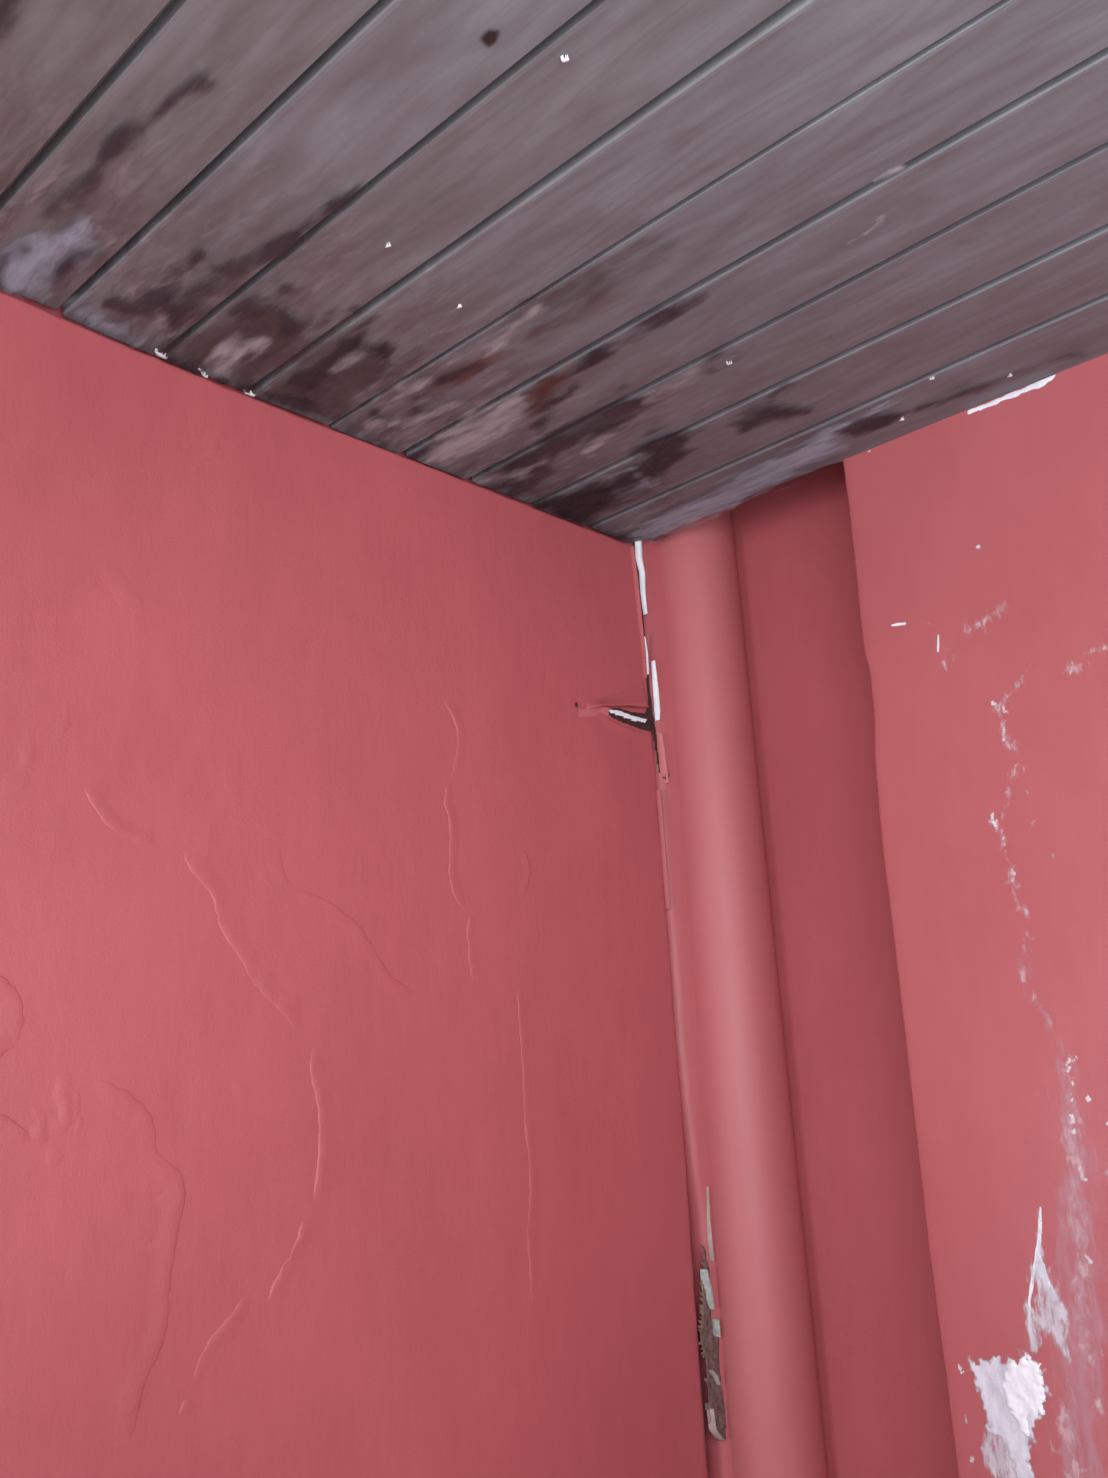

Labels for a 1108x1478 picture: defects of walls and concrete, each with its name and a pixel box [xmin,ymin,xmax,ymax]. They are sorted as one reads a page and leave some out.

leakage [59,78,210,203]
leakage [0,222,99,292]
leakage [104,188,358,327]
leakage [164,286,394,416]
leakage [477,390,688,526]
leakage [609,384,989,539]
crack [630,540,670,909]
spalling [697,1187,726,1441]
peeling [958,1207,1069,1478]